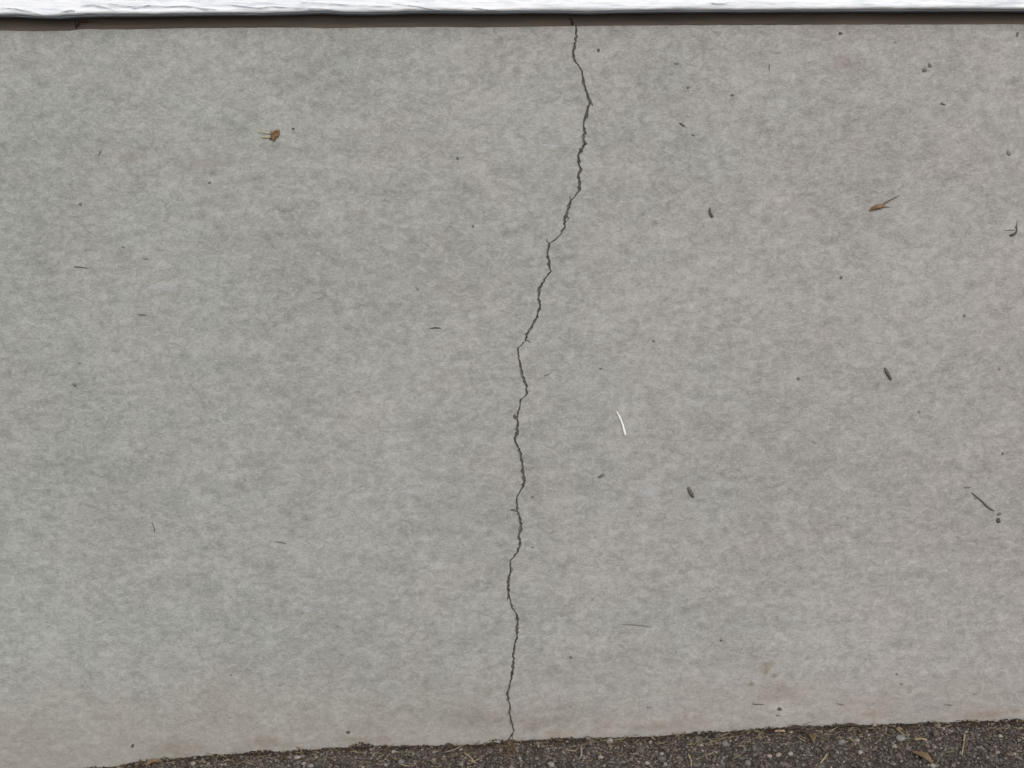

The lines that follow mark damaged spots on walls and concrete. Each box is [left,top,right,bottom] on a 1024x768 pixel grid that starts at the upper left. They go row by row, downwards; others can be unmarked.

crack [506,18,593,739]